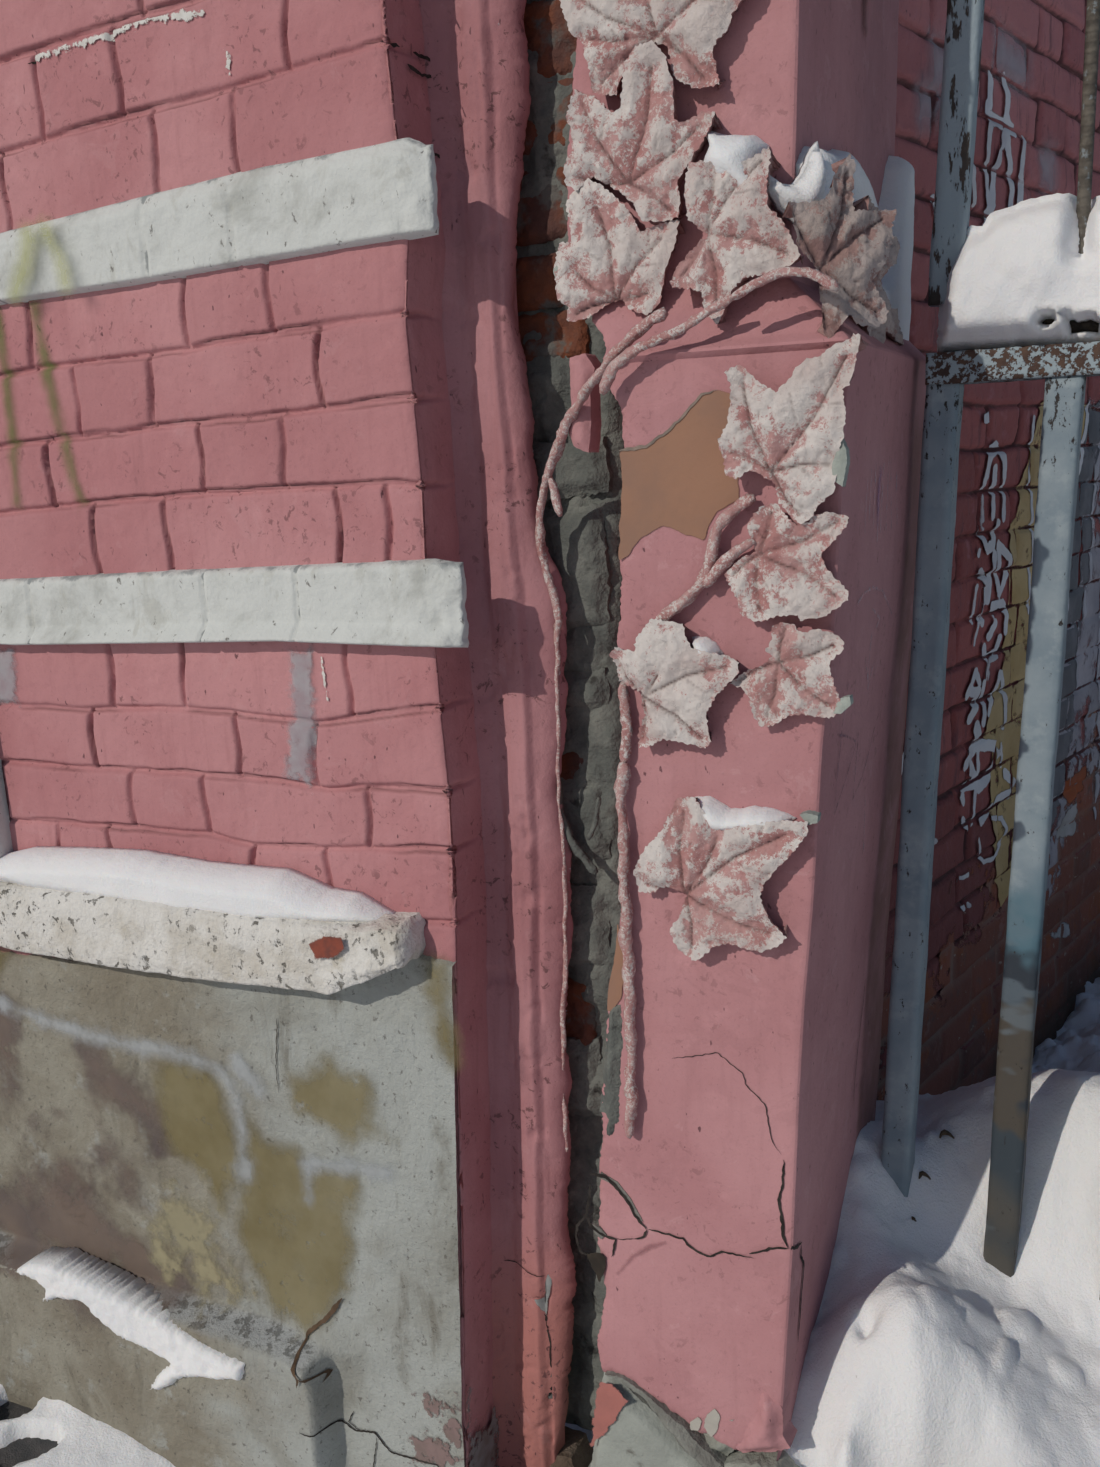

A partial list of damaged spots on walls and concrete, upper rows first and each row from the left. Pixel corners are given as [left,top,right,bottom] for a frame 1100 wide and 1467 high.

peeling [618,390,739,560]
crack [505,0,805,1431]
peeling [1033,710,1100,1058]
peeling [919,862,1009,1095]
peeling [876,992,890,1101]
crack [290,1298,342,1388]
crack [300,1411,439,1467]
spalling [407,1387,499,1467]
spalling [590,1371,734,1467]